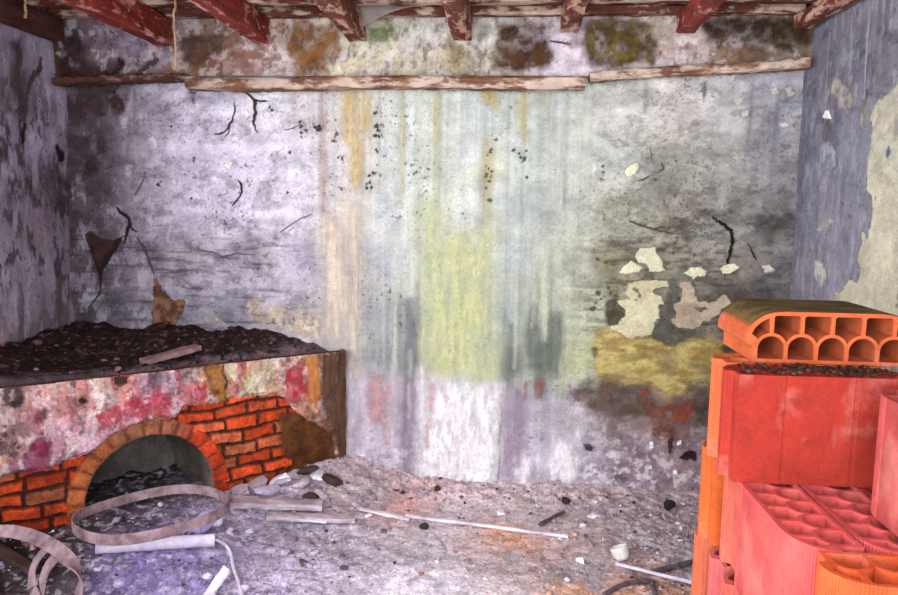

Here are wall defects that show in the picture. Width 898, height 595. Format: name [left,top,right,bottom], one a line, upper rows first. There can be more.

water stain [495,25,552,71]
water stain [582,18,656,68]
crack [214,93,267,137]
crack [232,180,243,206]
peeling [834,85,898,316]
crack [712,217,757,276]
spalling [151,278,185,325]
peeling [610,247,731,340]
water stain [246,208,531,484]
water stain [572,283,724,416]
spalling [173,393,296,490]
spalling [0,449,95,530]